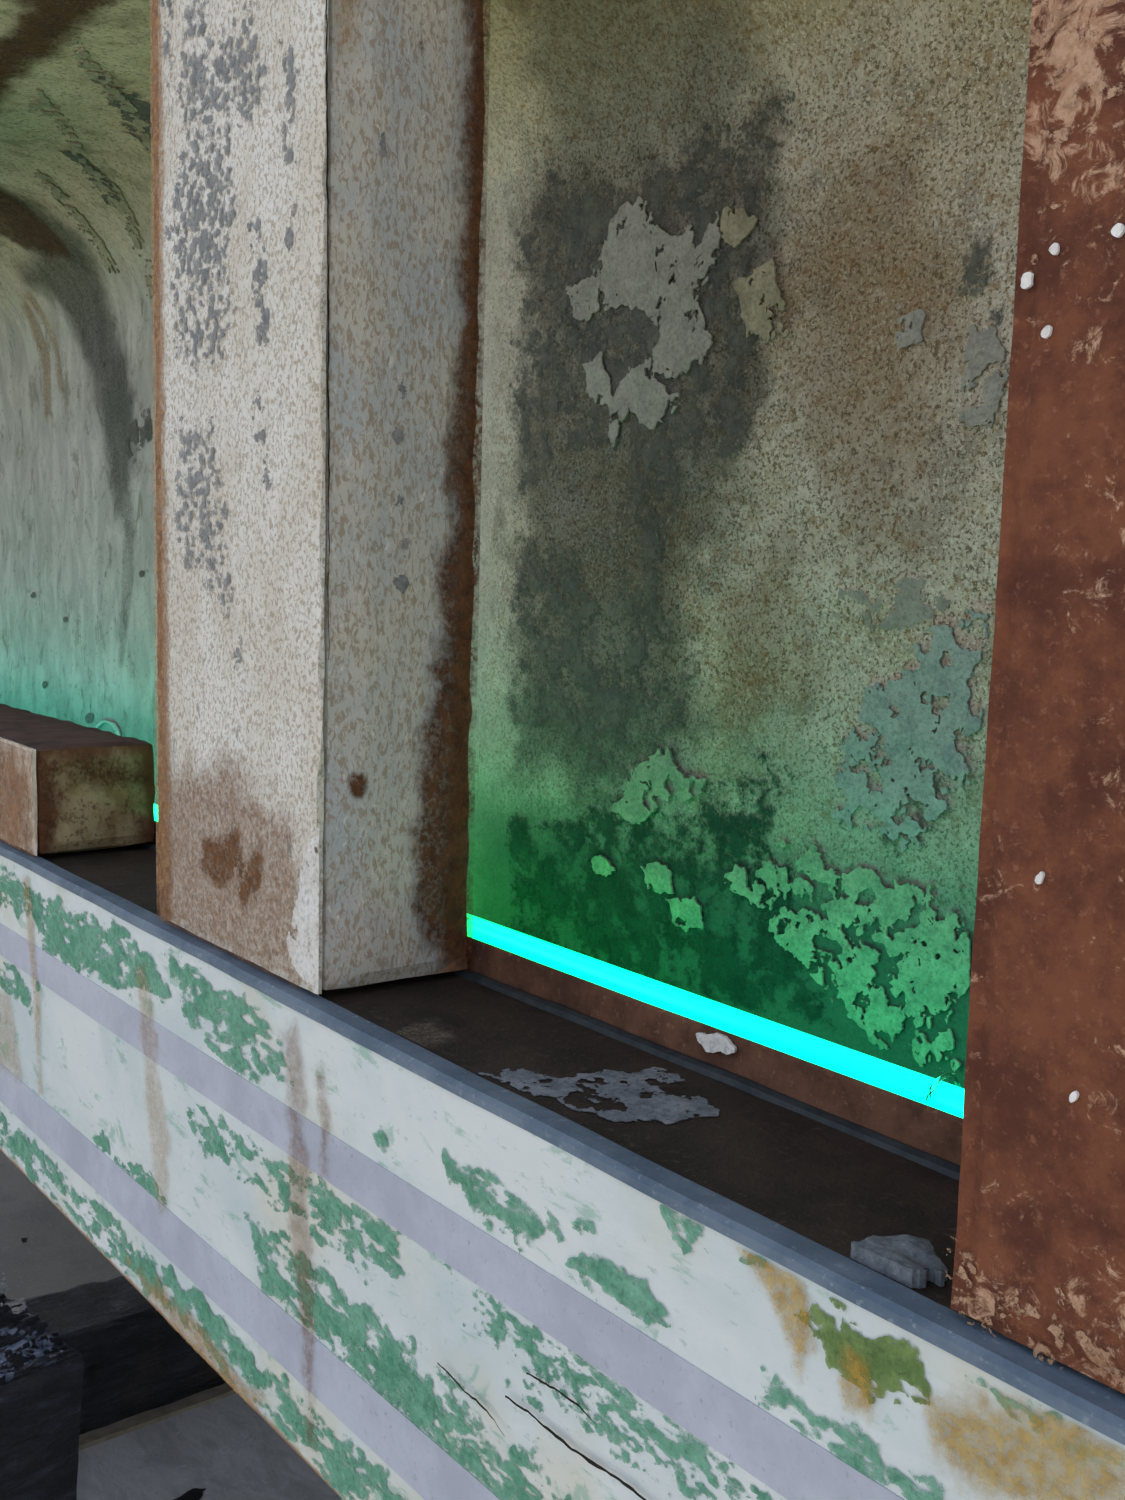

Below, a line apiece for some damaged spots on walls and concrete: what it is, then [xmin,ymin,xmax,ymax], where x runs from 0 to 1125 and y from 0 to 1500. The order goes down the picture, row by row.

peeling [29,0,302,378]
peeling [565,196,758,448]
rust [0,0,295,971]
peeling [172,416,242,668]
rust [412,0,491,963]
peeling [831,575,989,858]
peeling [504,747,971,1083]
peeling [186,1102,571,1500]
peeling [441,1148,671,1328]
peeling [478,1067,720,1124]
peeling [463,1289,771,1500]
peeling [659,1204,708,1255]